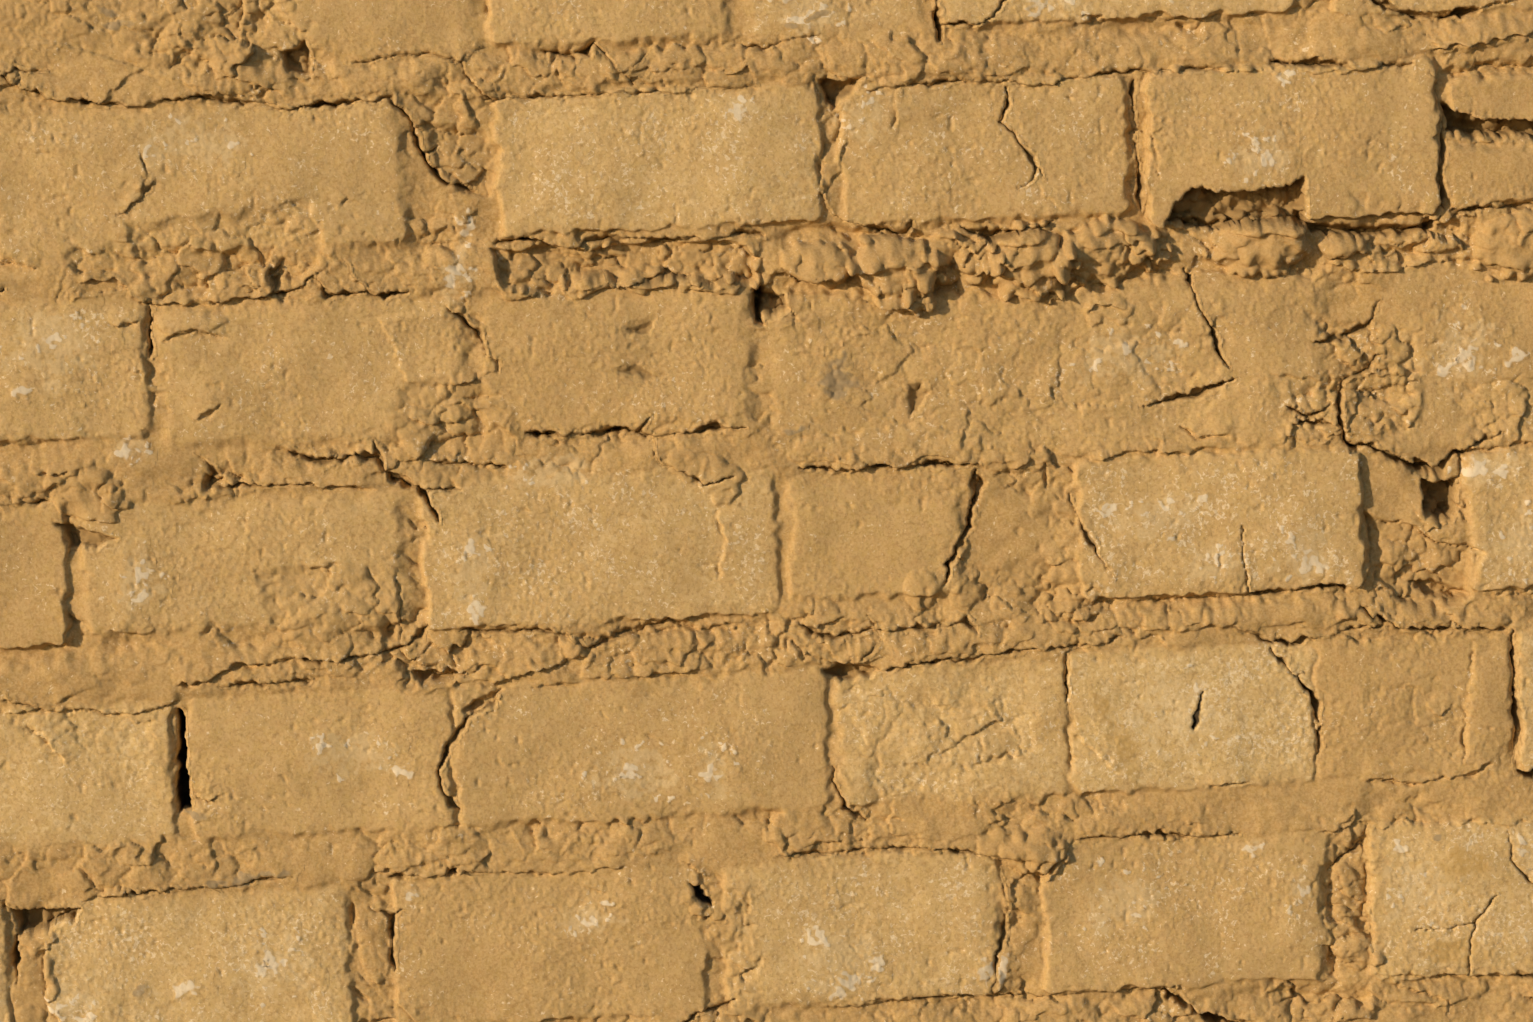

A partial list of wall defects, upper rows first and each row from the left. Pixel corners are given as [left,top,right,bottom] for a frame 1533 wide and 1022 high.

crack [1360,0,1483,23]
crack [995,80,1047,192]
crack [796,468,981,663]
spalling [1064,437,1533,620]
crack [288,624,501,814]
spalling [1190,691,1204,730]
peeling [1511,649,1533,741]